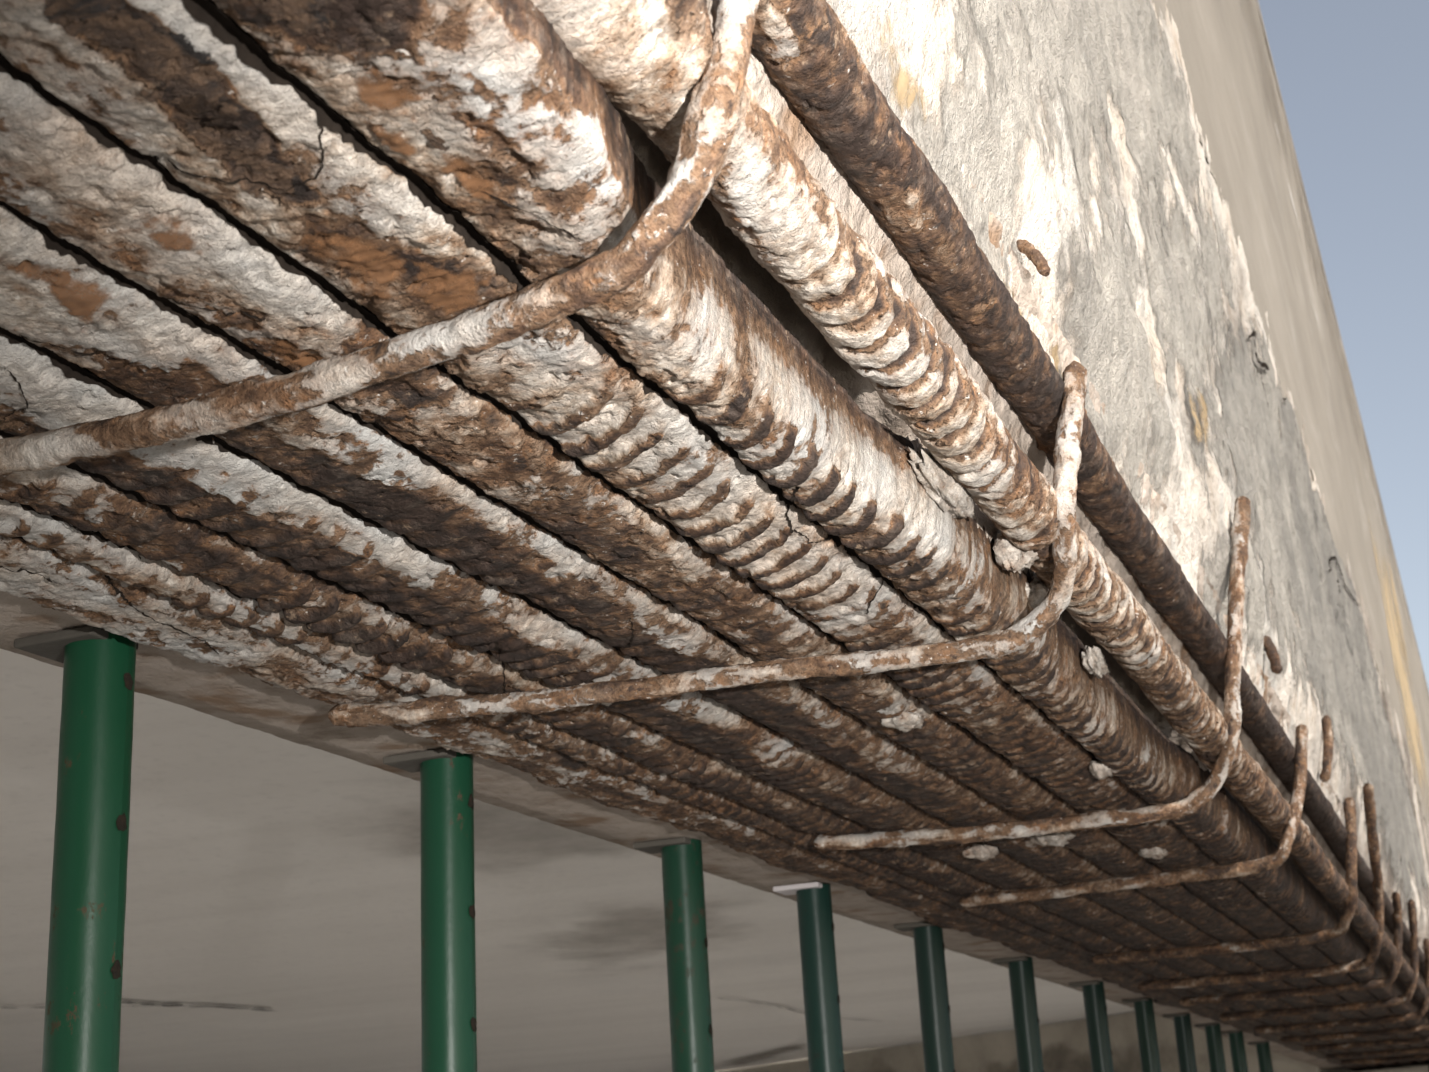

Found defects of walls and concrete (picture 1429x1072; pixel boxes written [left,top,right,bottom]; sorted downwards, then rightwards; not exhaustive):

corrosion [358,67,422,155]
corrosion [895,66,926,122]
corrosion [442,154,494,200]
corrosion [144,218,194,251]
spalling [0,0,713,439]
corrosion [8,260,108,321]
corrosion [305,233,487,314]
corrosion [275,339,324,368]
spalling [0,79,1059,707]
corrosion [1189,390,1208,443]
spalling [391,0,1429,1071]